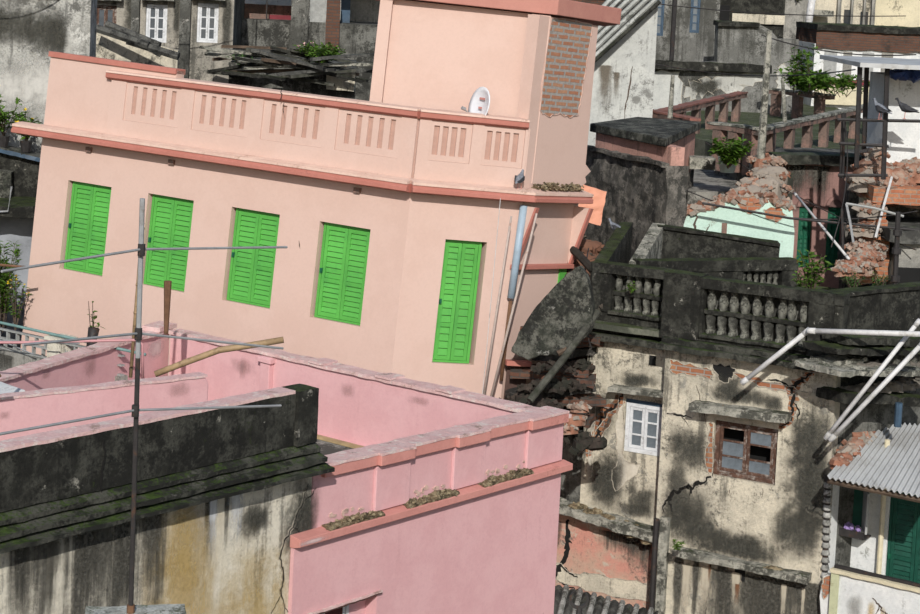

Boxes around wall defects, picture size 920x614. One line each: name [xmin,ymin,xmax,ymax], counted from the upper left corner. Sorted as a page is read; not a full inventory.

flaking render [539,18,593,118]
spalling [669,359,834,398]
crack [768,371,814,429]
spalling [588,393,641,491]
leakage [591,455,652,516]
crack [661,473,730,514]
spalling [705,422,714,477]
leakage [664,390,828,562]
leakage [9,495,267,614]
crack [271,483,315,614]
crack [556,519,584,593]
leakage [673,558,821,614]